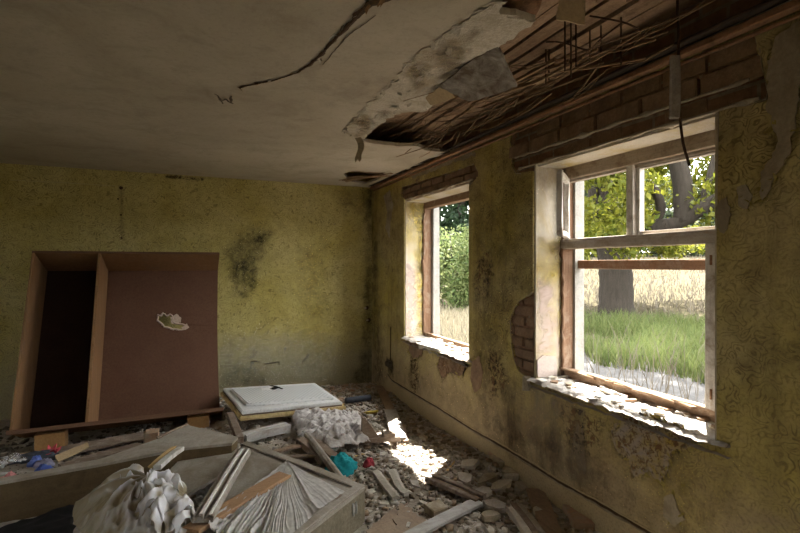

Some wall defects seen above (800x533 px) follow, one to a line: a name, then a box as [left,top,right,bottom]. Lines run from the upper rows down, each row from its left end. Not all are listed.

crack [215,0,391,104]
flaking render [342,0,534,139]
peeling [753,21,800,204]
flaking render [402,165,478,200]
peeling [714,197,731,234]
flaking render [435,354,507,395]
flaking render [510,285,558,391]